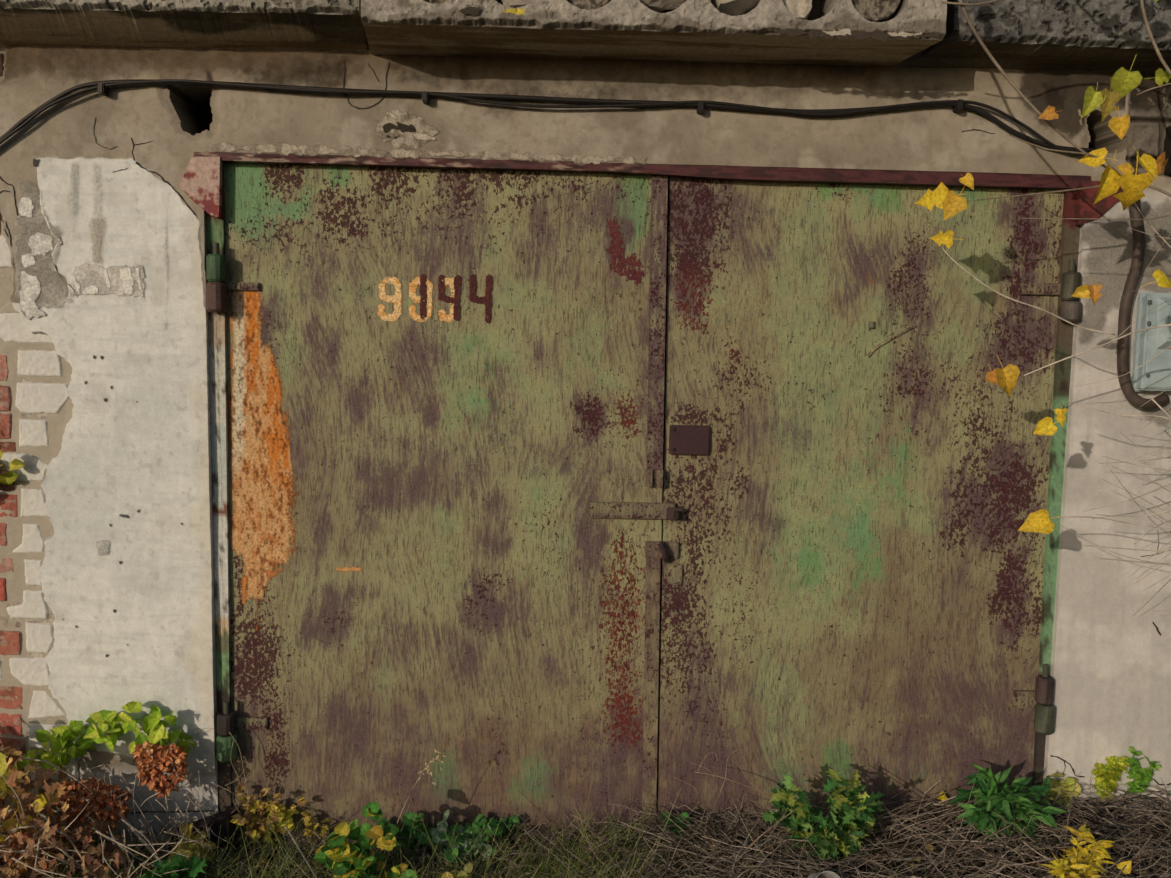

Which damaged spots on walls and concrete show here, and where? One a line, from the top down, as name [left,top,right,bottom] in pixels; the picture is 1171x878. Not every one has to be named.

spalling [211,109,647,164]
rust [603,218,645,317]
spalling [0,181,145,837]
rust [227,290,299,631]
rust [594,529,640,748]